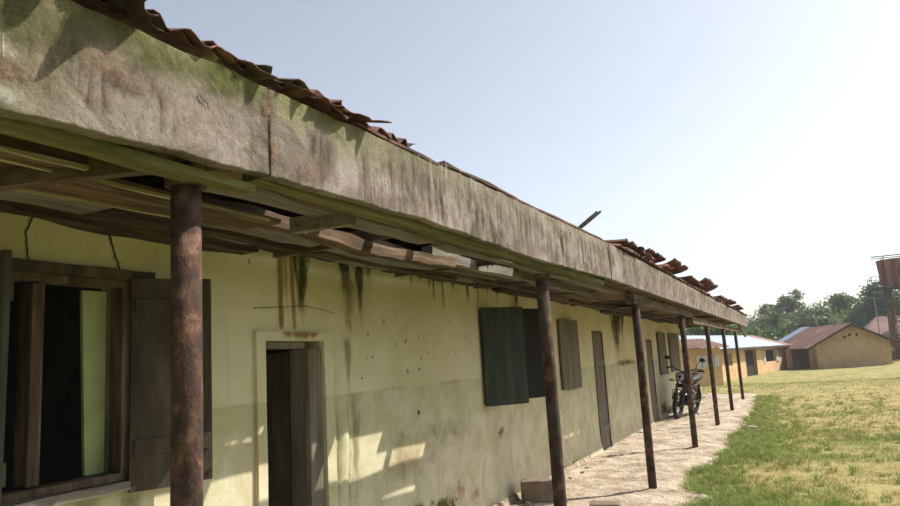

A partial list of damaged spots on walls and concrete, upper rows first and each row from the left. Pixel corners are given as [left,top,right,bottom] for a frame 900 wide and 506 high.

crack [25,217,33,259]
crack [109,236,121,269]
rust [278,256,317,337]
leakage [292,255,306,306]
leakage [341,263,370,315]